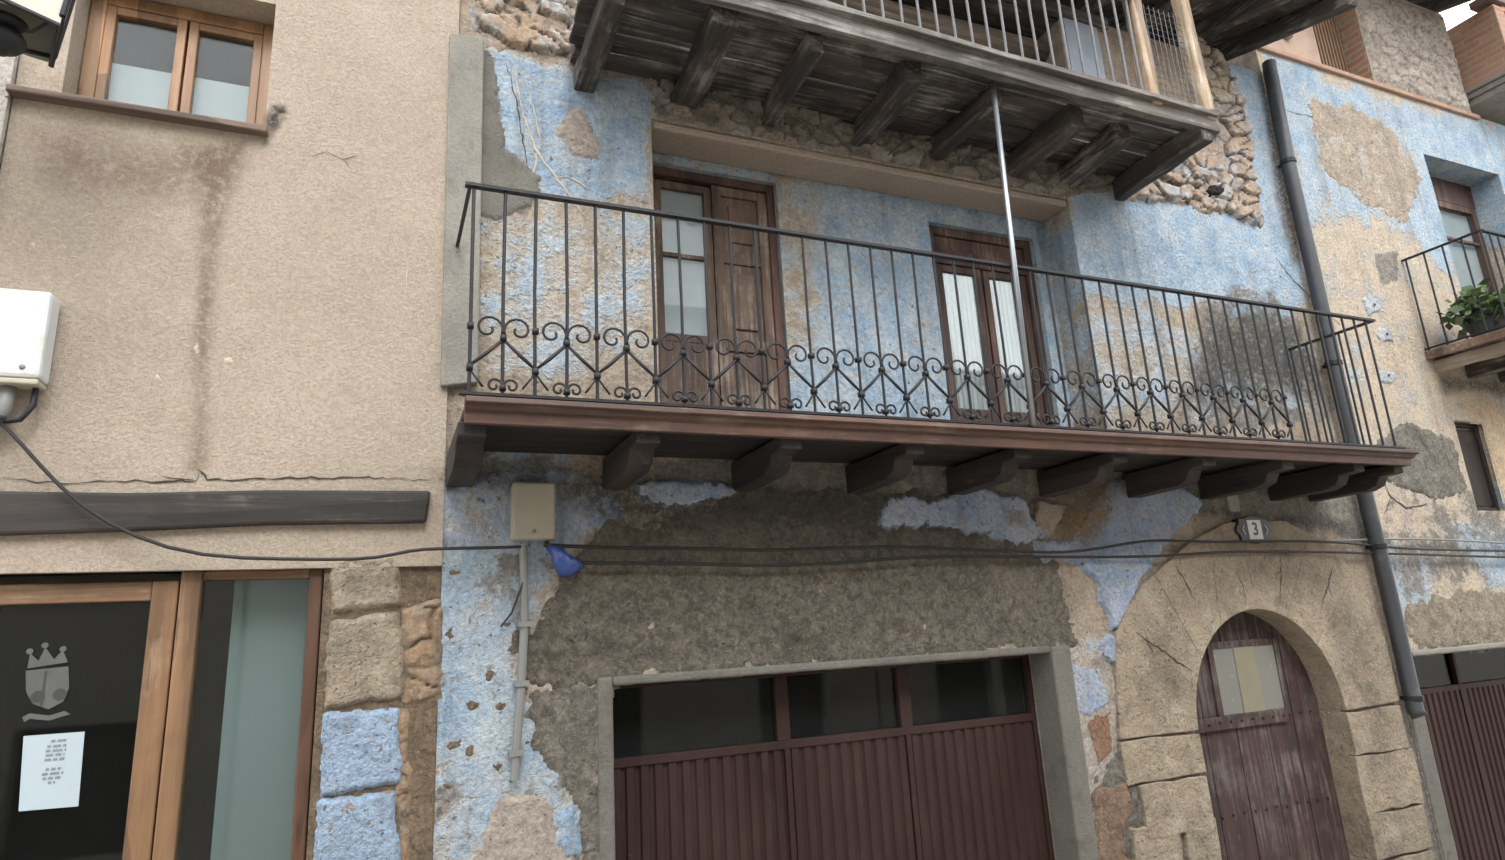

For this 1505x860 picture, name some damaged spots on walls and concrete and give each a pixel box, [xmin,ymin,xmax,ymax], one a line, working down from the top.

spalling [1307,97,1423,224]
crack [3,469,424,485]
spalling [1376,421,1467,500]
spalling [1404,587,1505,656]
spalling [442,465,1203,860]